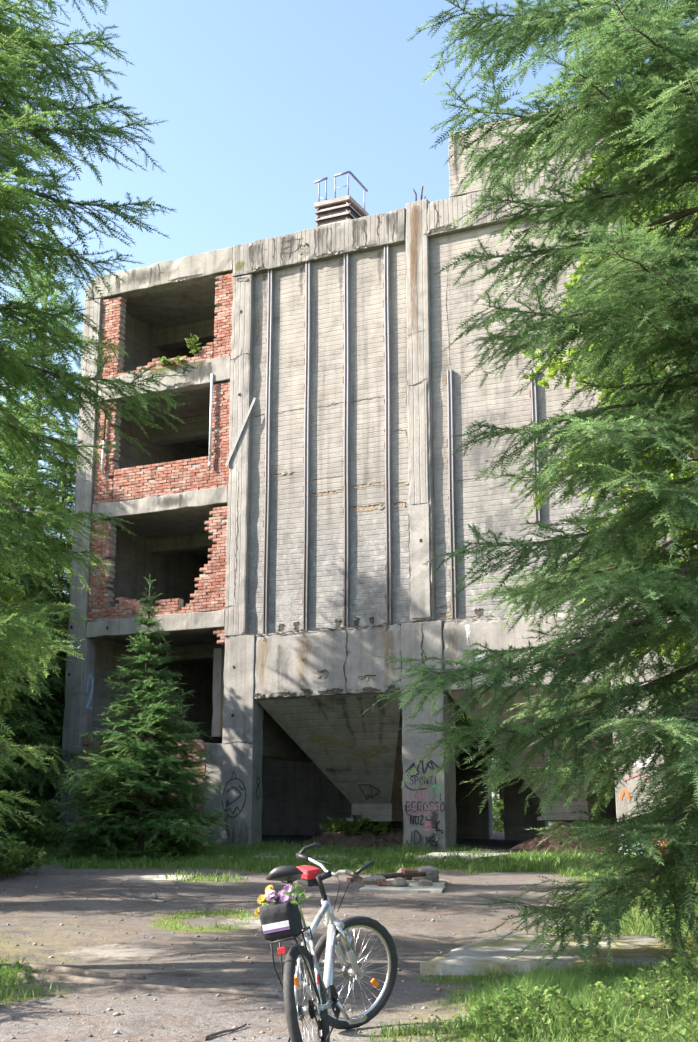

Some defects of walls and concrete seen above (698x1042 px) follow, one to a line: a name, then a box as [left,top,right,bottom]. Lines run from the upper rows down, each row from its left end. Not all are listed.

rust [410,207,419,282]
crack [225,475,239,608]
crack [226,509,504,696]